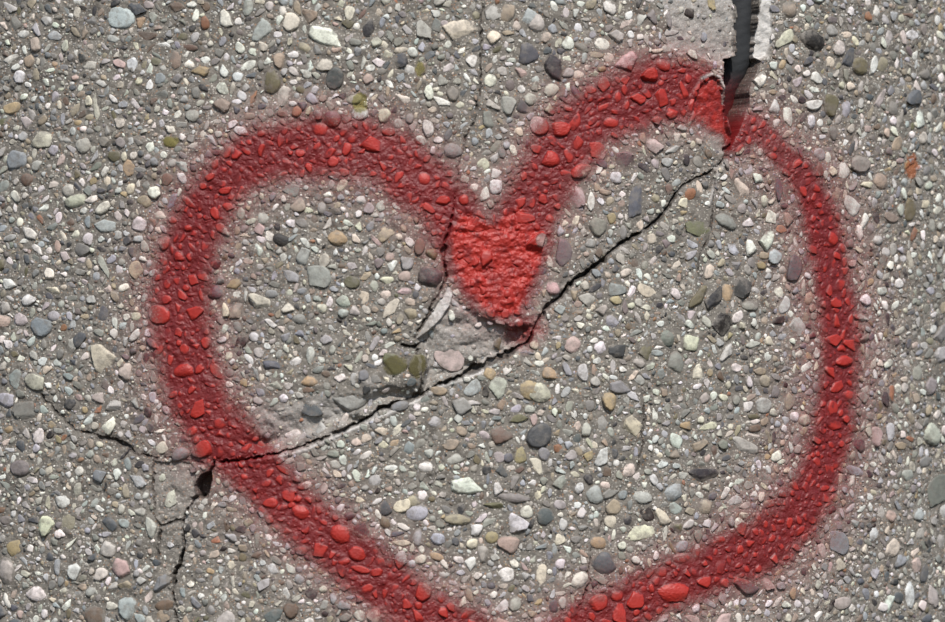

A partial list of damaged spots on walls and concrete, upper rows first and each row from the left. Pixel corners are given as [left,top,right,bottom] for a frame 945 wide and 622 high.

spalling [661,0,737,66]
spalling [752,0,775,60]
spalling [696,76,730,154]
crack [40,0,761,622]